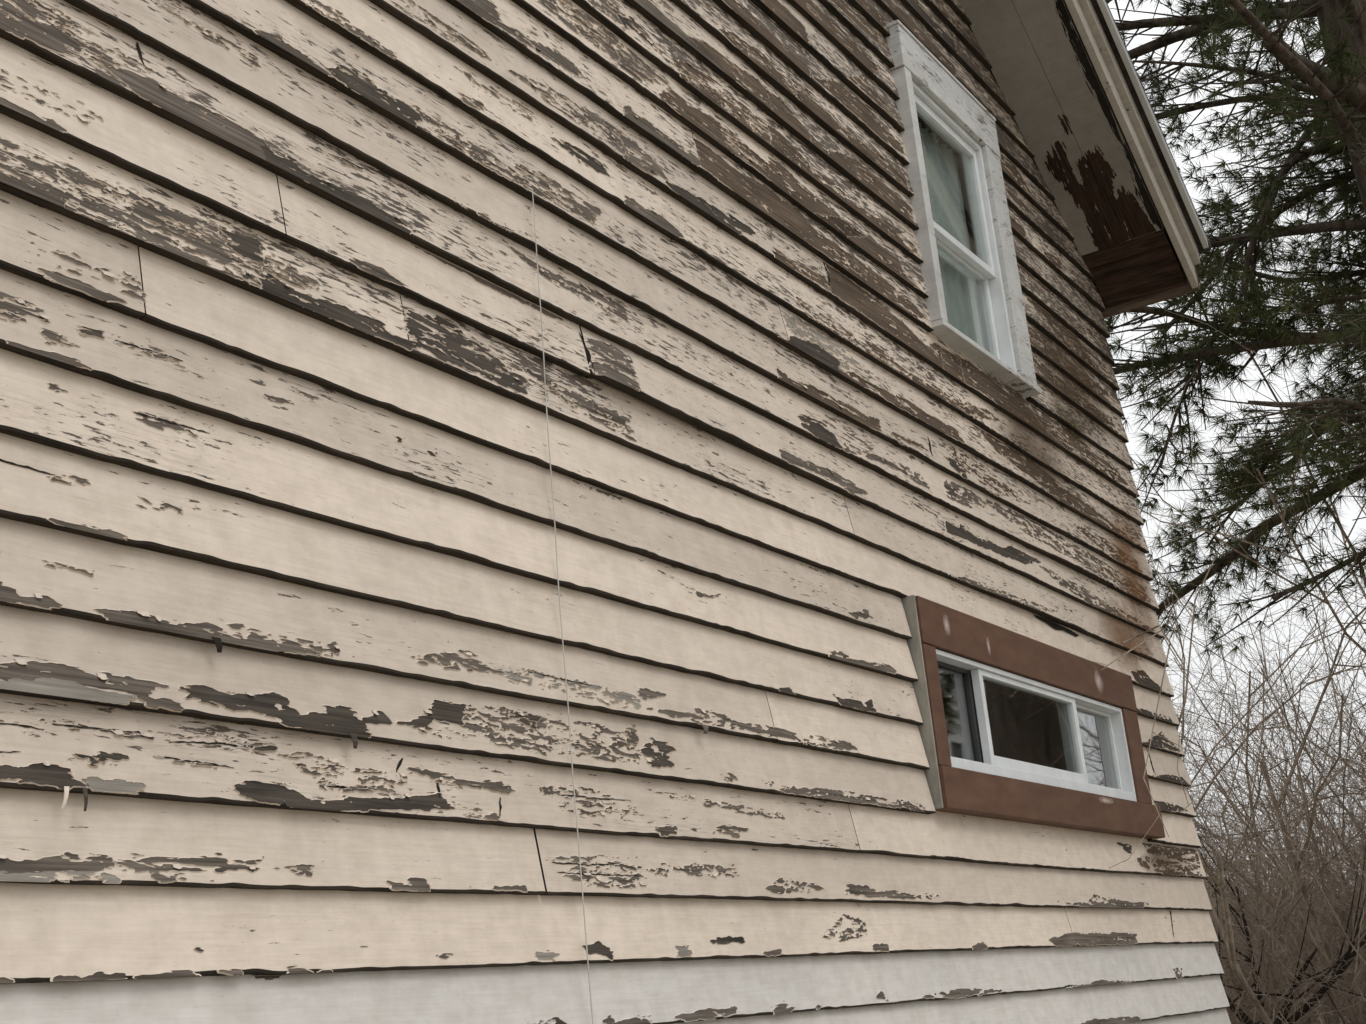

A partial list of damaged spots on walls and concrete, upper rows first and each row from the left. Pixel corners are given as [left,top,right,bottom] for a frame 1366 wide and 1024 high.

peeling [0,0,602,322]
peeling [0,137,637,442]
peeling [453,0,1163,633]
peeling [0,649,859,769]
peeling [0,717,516,821]
peeling [538,784,638,819]
peeling [0,850,315,884]
peeling [545,854,739,890]
peeling [765,877,825,895]
peeling [844,882,940,900]
peeling [822,913,889,952]
peeling [1048,931,1138,947]